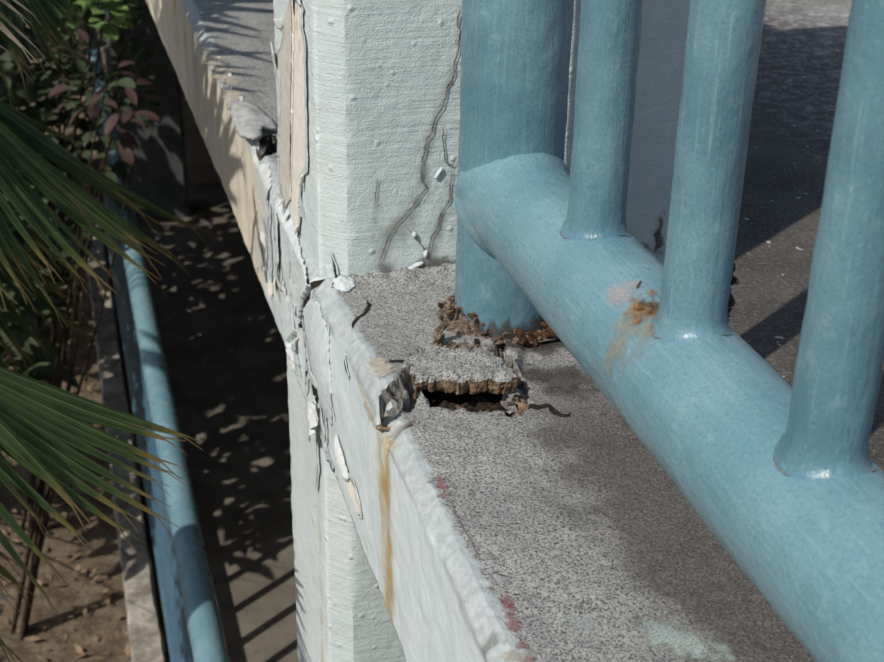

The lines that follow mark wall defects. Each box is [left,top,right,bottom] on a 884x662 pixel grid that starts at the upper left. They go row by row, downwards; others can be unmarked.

peeling [226,0,311,318]
crack [377,7,462,271]
corrosion [431,294,567,358]
corrosion [610,290,659,356]
peeling [286,343,362,519]
corrosion [378,442,393,507]
spalling [359,338,529,432]